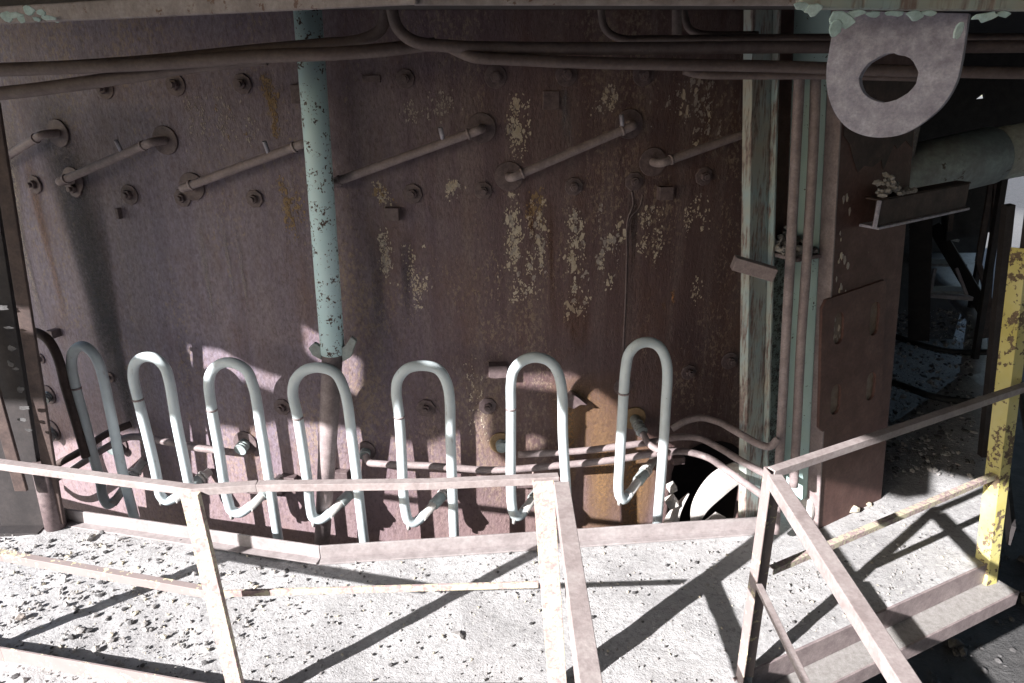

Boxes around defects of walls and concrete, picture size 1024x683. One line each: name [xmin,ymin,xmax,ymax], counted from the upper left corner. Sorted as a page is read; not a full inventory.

peeling [505,93,531,162]
peeling [590,84,618,116]
peeling [665,77,722,146]
peeling [377,227,433,311]
peeling [497,187,550,304]
peeling [559,204,665,321]
peeling [684,194,710,233]
rust [568,408,578,460]
rust [592,415,610,522]
rust [622,459,648,525]